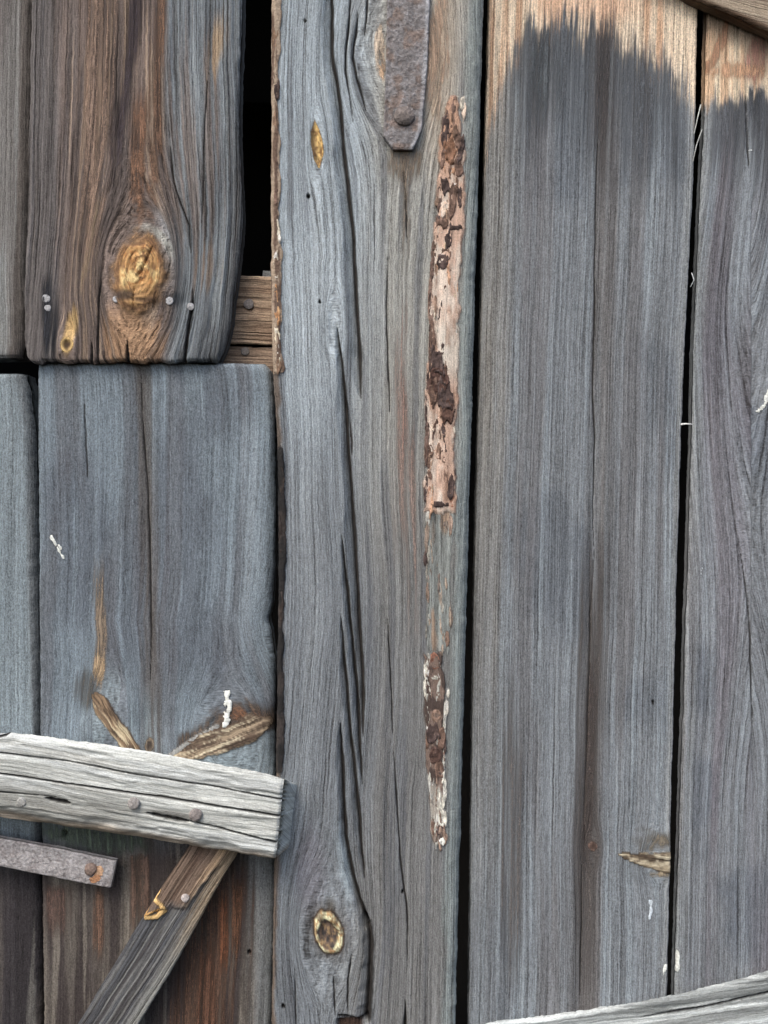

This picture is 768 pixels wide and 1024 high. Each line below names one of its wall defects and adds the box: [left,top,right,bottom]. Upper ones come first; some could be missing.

rust [374,26,385,78]
leakage [515,2,681,178]
leakage [712,88,768,180]
crack [330,0,374,1021]
peeling [423,95,466,851]